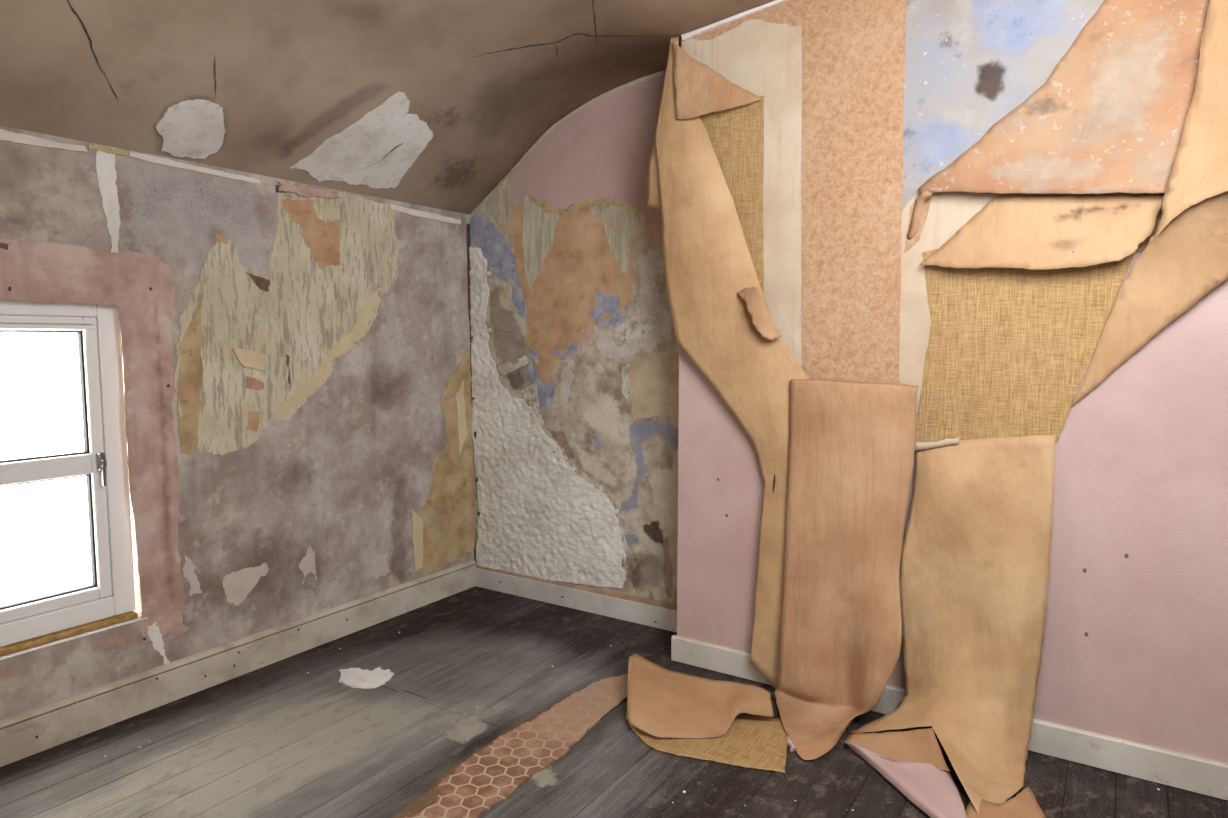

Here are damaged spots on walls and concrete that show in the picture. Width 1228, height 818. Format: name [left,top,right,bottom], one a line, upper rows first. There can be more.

crack [67,0,118,99]
crack [464,0,658,59]
peeling [683,0,1168,460]
peeling [232,348,268,390]
flaking render [0,238,202,642]
peeling [247,411,260,432]
flaking render [456,213,679,589]
peeling [222,563,269,606]
peeling [298,545,317,585]